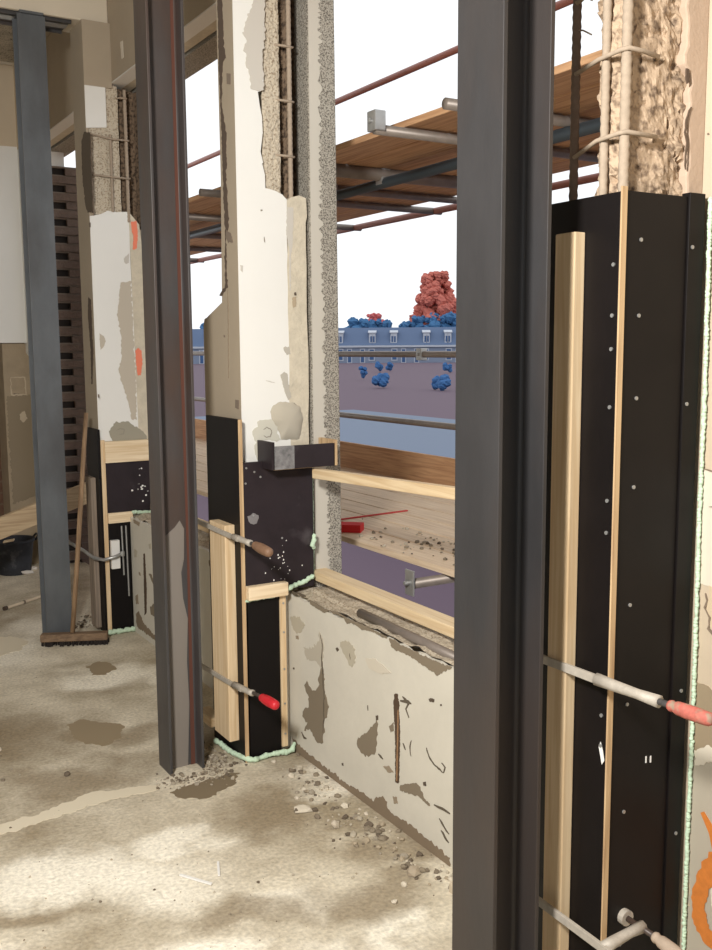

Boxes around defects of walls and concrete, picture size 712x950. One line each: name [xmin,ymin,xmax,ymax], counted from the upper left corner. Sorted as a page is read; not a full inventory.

spalling [569,0,582,201]
spalling [594,0,690,196]
spalling [242,0,309,445]
flaking render [117,281,137,420]
damp [67,719,125,746]
damp [165,520,189,769]
damp [170,773,240,799]
spalling [290,616,329,744]
spalling [292,738,451,867]
spalling [357,720,394,757]
flaking render [686,755,712,950]
crack [703,593,712,635]